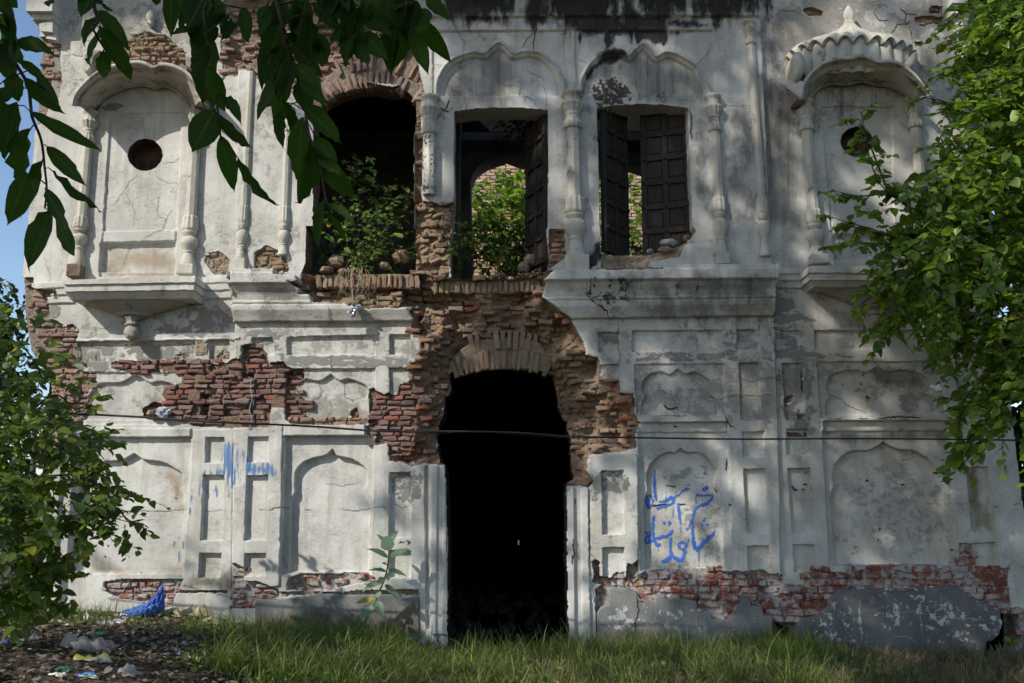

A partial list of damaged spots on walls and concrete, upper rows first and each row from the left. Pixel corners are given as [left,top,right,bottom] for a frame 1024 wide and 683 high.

spalling [218,0,292,85]
spalling [309,0,384,87]
water stain [445,0,773,111]
spalling [409,49,455,278]
spalling [205,251,230,275]
spalling [255,245,289,273]
spalling [22,277,419,455]
peeling [590,469,630,501]
spalling [101,563,420,609]
spalling [592,504,1024,653]